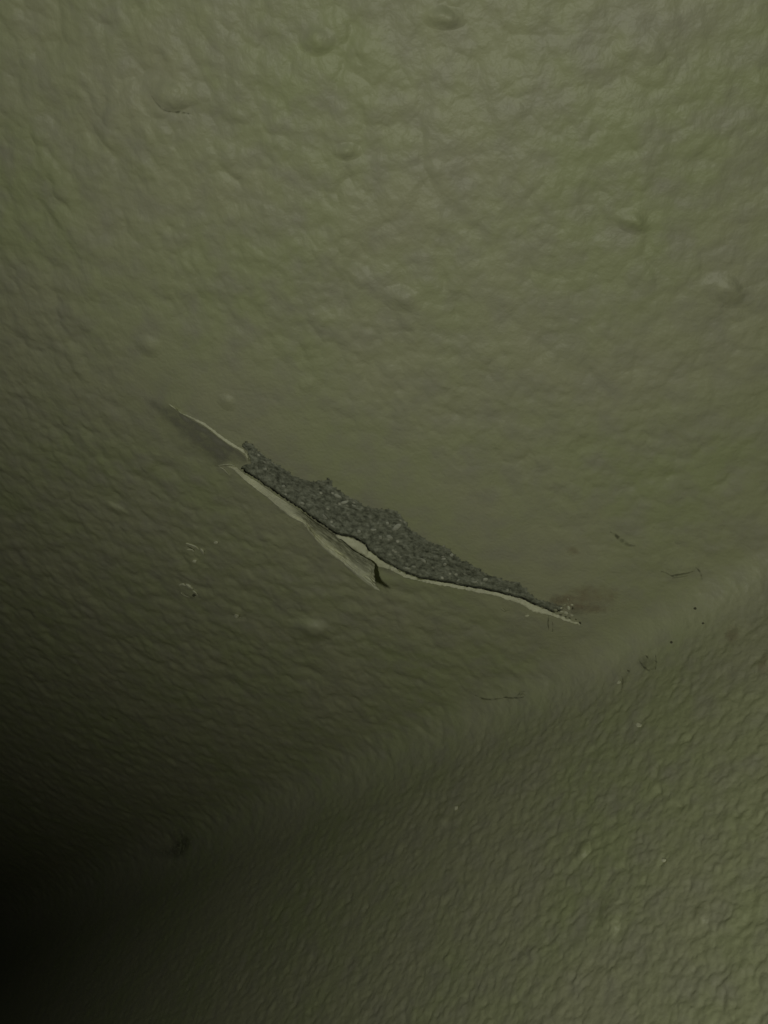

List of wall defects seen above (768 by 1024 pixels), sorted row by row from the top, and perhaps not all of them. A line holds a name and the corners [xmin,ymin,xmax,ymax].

peeling [170,405,581,625]